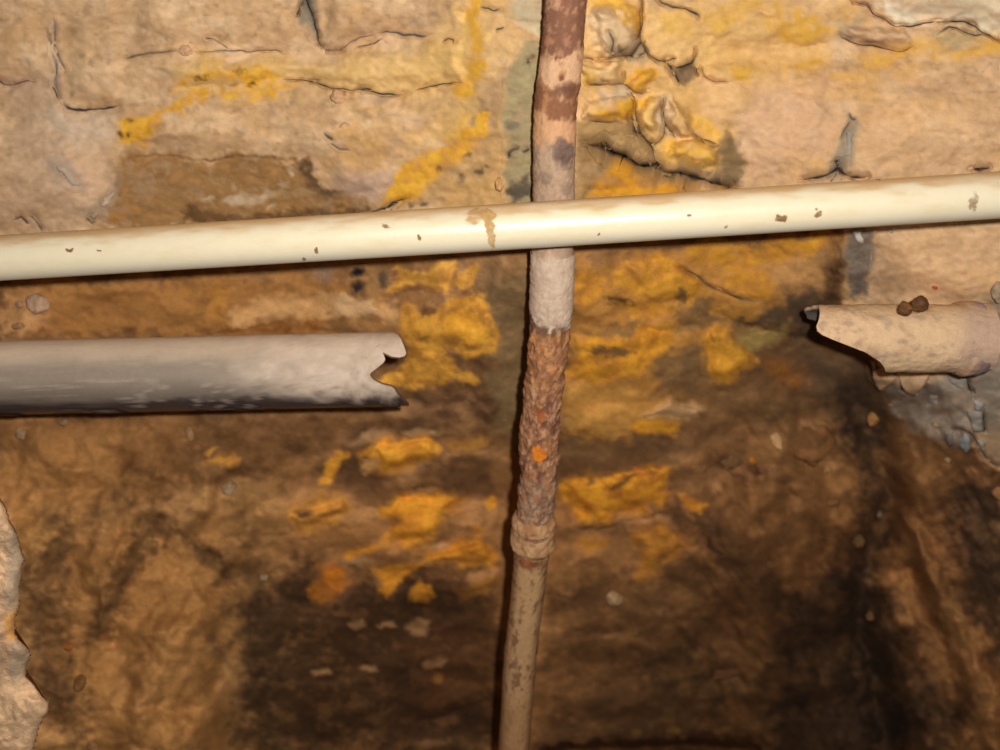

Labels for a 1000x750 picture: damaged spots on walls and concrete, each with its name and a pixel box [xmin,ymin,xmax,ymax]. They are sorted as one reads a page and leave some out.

crack [0,16,121,115]
crack [123,0,462,97]
leakage [88,0,545,229]
crack [797,112,871,183]
crack [970,159,992,173]
leakage [346,257,505,393]
leakage [560,229,842,443]
leakage [279,424,505,640]
leakage [555,460,711,585]
leakage [308,665,333,679]
leakage [355,662,381,674]
leakage [418,653,450,687]